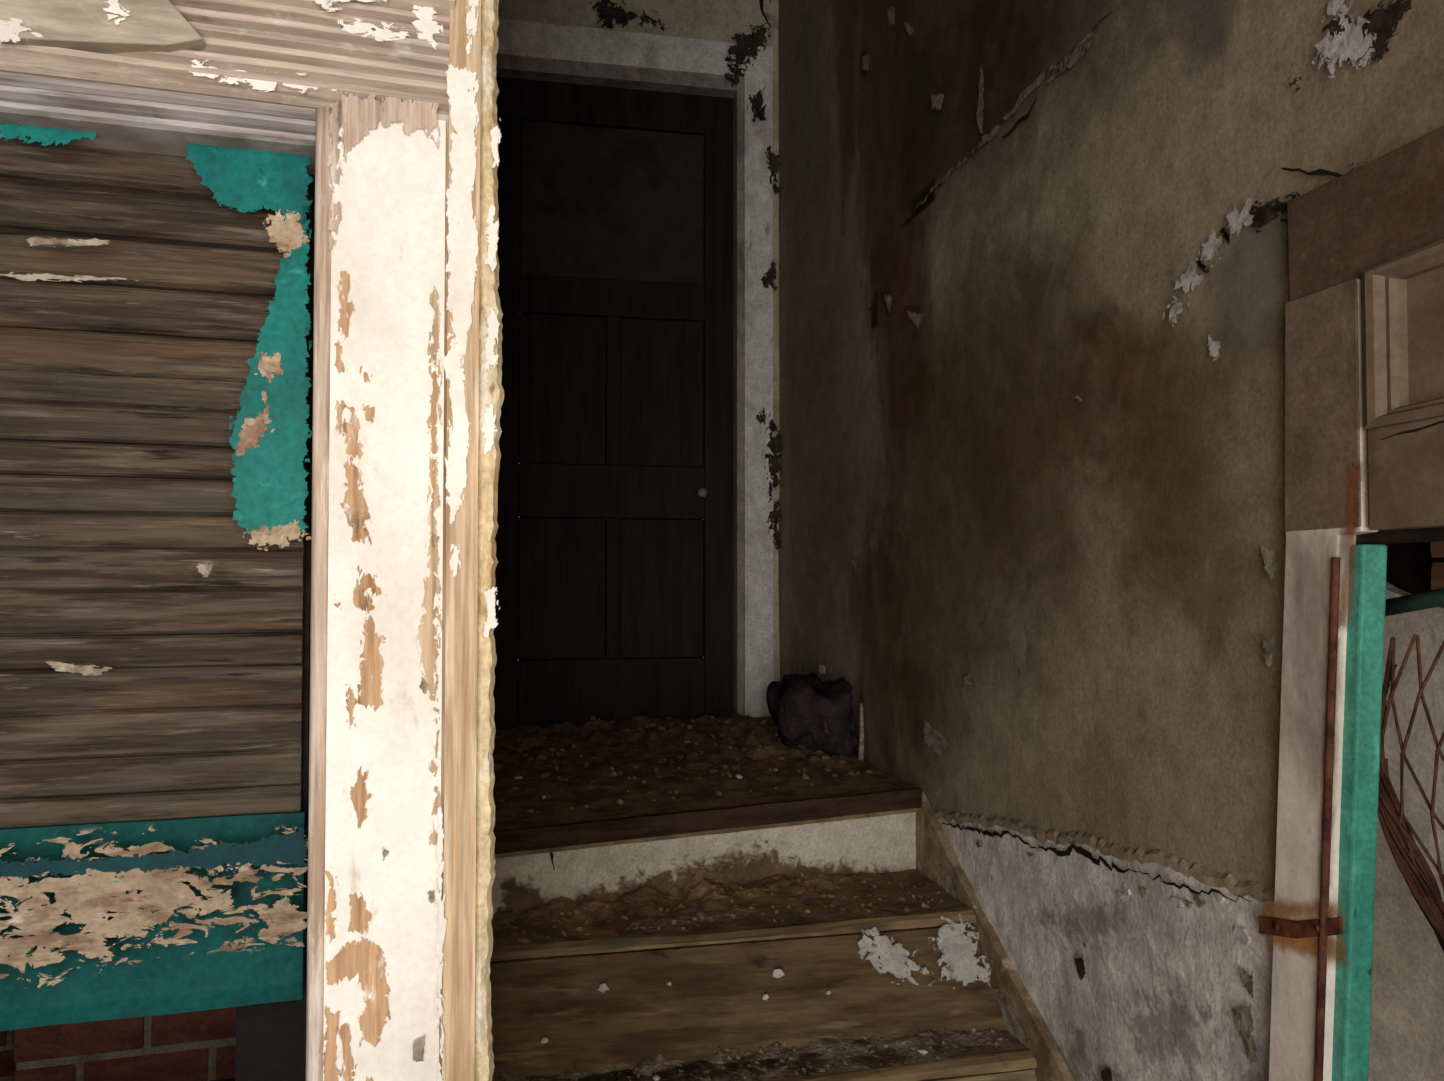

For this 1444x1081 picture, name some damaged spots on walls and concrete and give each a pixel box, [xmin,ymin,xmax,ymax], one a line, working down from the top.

spalling [590,0,665,32]
peeling [724,20,773,123]
peeling [1285,0,1412,92]
peeling [765,146,783,194]
peeling [760,261,780,290]
peeling [1162,191,1300,331]
peeling [1207,335,1221,363]
peeling [756,408,783,550]
spalling [319,0,504,1081]
spalling [1431,541,1444,590]
crack [941,822,1248,903]